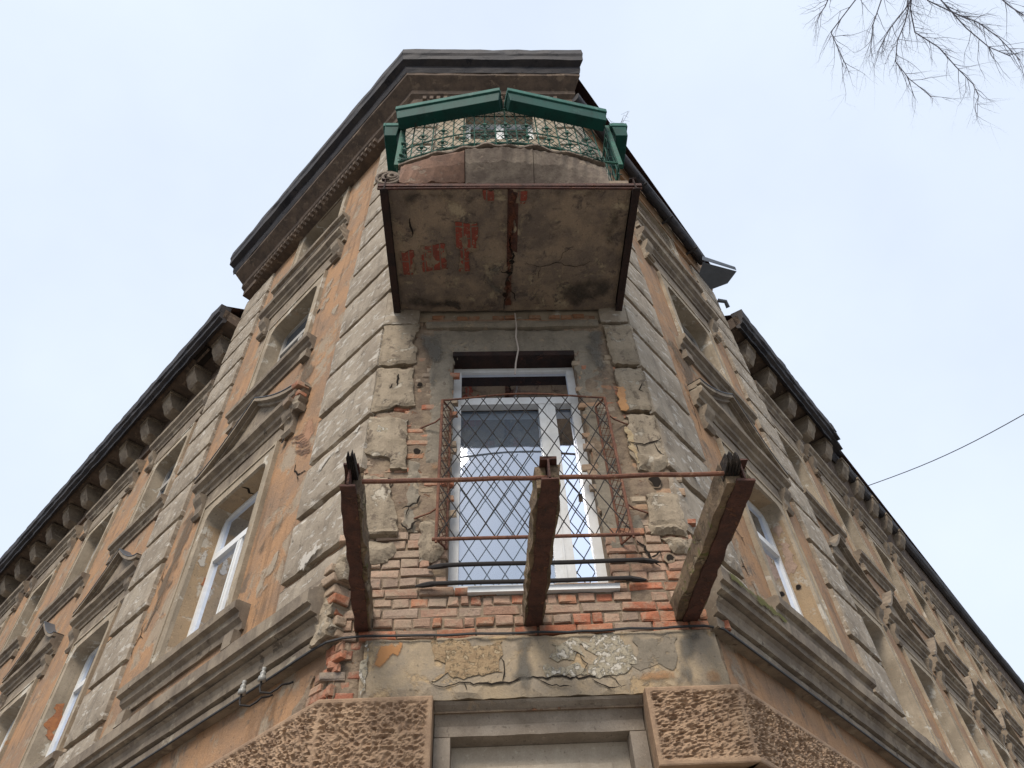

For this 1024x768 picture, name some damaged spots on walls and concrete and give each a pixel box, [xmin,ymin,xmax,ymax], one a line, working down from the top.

crack [501,230,590,310]
crack [401,495,421,531]
flaking render [288,314,710,718]
crack [429,649,625,689]
flaking render [44,703,65,741]